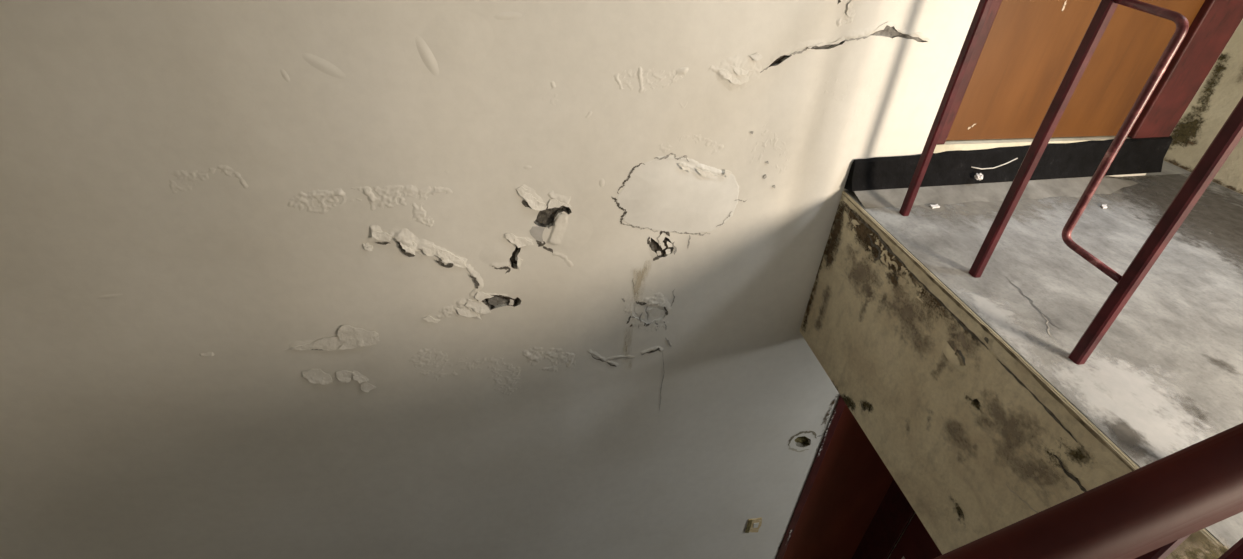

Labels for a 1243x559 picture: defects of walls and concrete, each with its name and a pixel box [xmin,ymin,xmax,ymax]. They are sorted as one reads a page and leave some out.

crack [760,22,932,73]
flaking render [363,184,593,323]
flaking render [622,279,675,332]
flaking render [647,230,677,261]
leakage [802,194,979,352]
leakage [952,289,1041,358]
peeling [301,369,376,392]
spalling [788,396,837,457]
leakage [982,399,1057,485]
leakage [1053,354,1211,464]